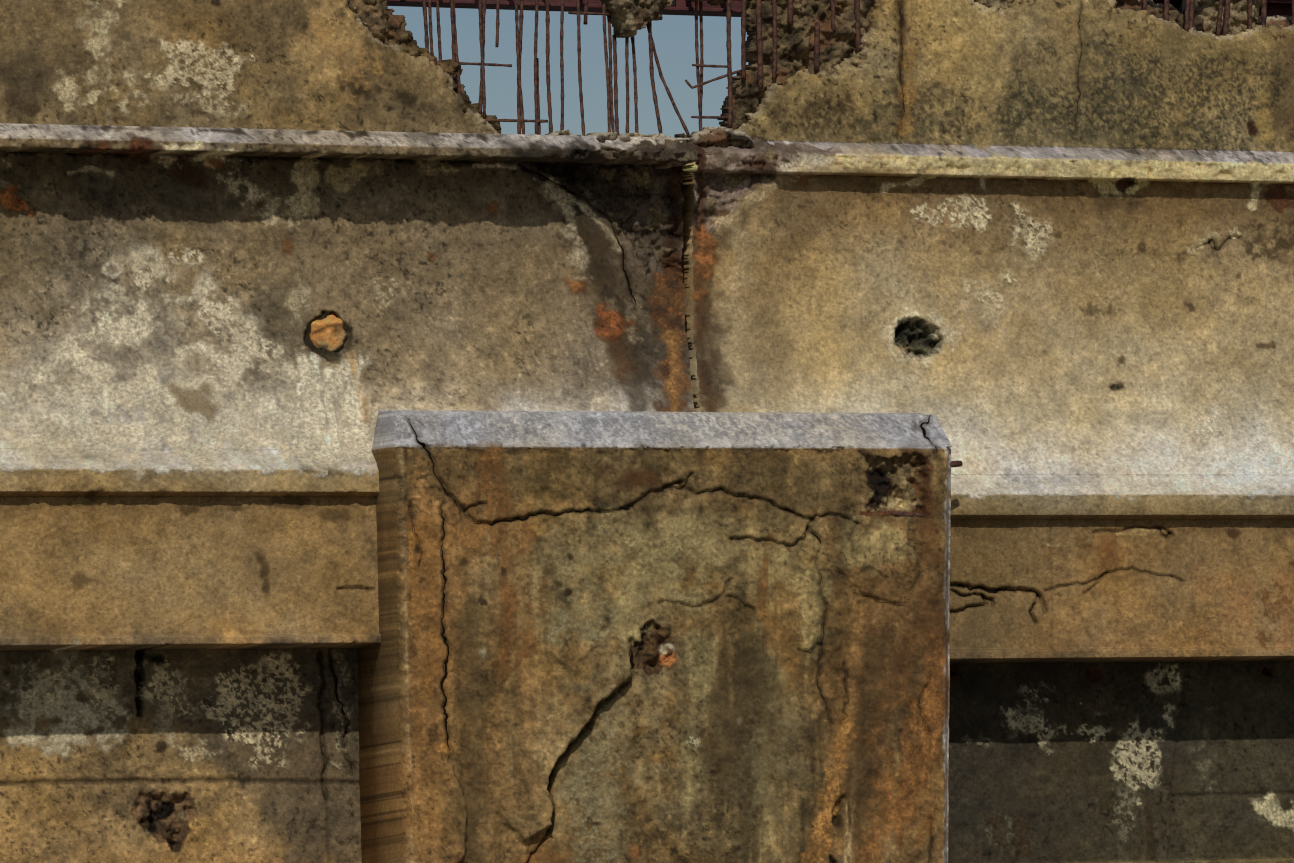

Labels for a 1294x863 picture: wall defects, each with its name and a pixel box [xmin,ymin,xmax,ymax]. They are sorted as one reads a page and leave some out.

water stain [54,0,255,111]
spalling [362,0,501,134]
crack [518,165,673,303]
rust [594,304,634,341]
rust [649,145,717,412]
spalling [894,318,943,358]
crack [409,420,849,754]
crack [950,569,1167,622]
water stain [4,652,127,756]
water stain [135,653,310,768]
water stain [1006,665,1182,860]
spalling [132,790,197,852]